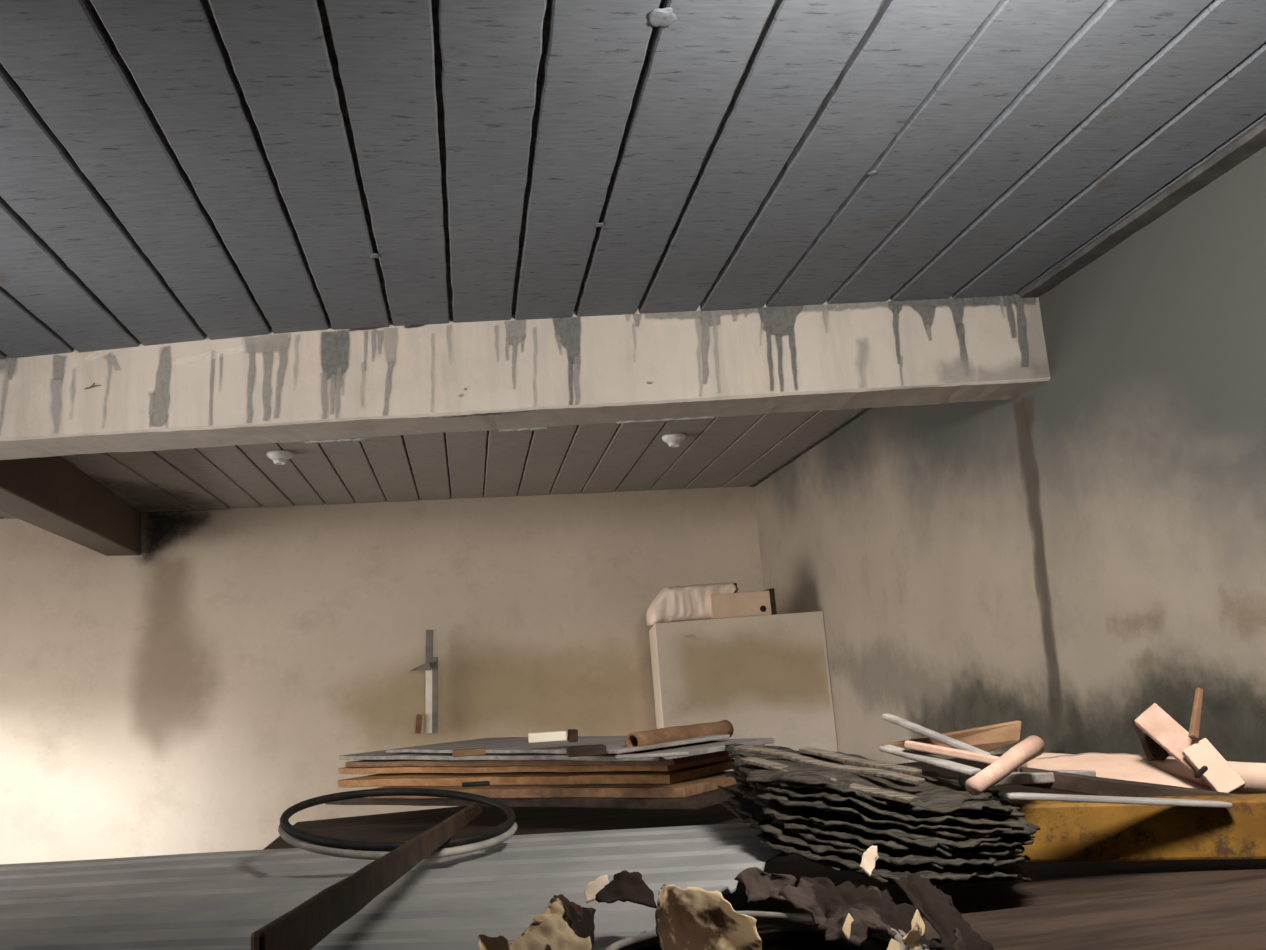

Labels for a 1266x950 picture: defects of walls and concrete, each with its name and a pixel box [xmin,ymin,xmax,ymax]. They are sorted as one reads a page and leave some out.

damp [0,355,16,426]
damp [51,356,73,433]
damp [149,347,170,426]
damp [210,351,223,426]
damp [245,334,297,423]
damp [321,328,397,419]
damp [495,320,537,405]
damp [552,317,581,405]
damp [696,306,803,391]
damp [888,295,1029,386]
damp [912,674,1266,763]